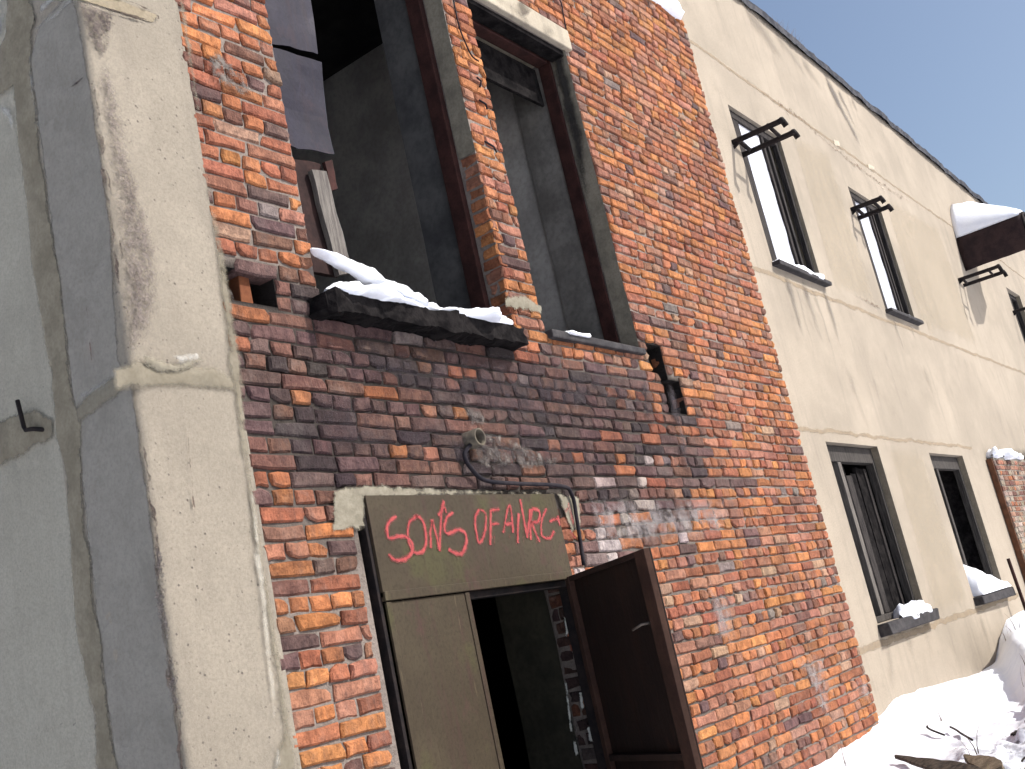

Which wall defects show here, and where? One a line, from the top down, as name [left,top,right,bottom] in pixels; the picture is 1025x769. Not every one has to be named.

crack [144,449,160,589]
crack [161,624,183,769]